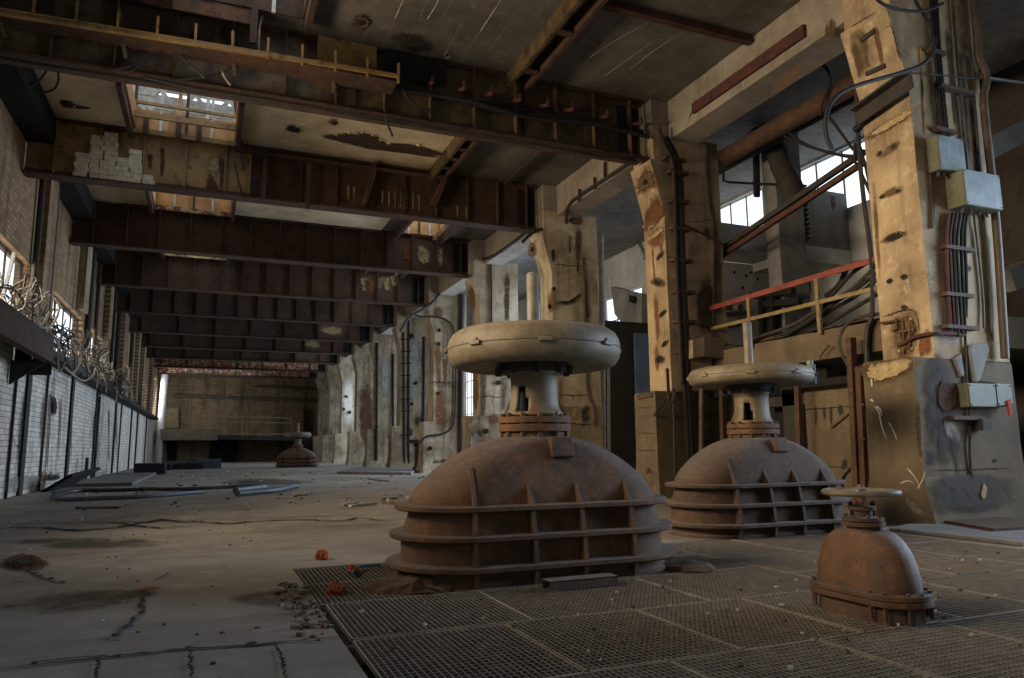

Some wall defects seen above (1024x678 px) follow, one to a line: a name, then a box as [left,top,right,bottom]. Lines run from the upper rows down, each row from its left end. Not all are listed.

spalling [635,167,668,242]
corrosion [649,230,665,279]
crack [9,513,397,530]
crack [0,570,339,678]